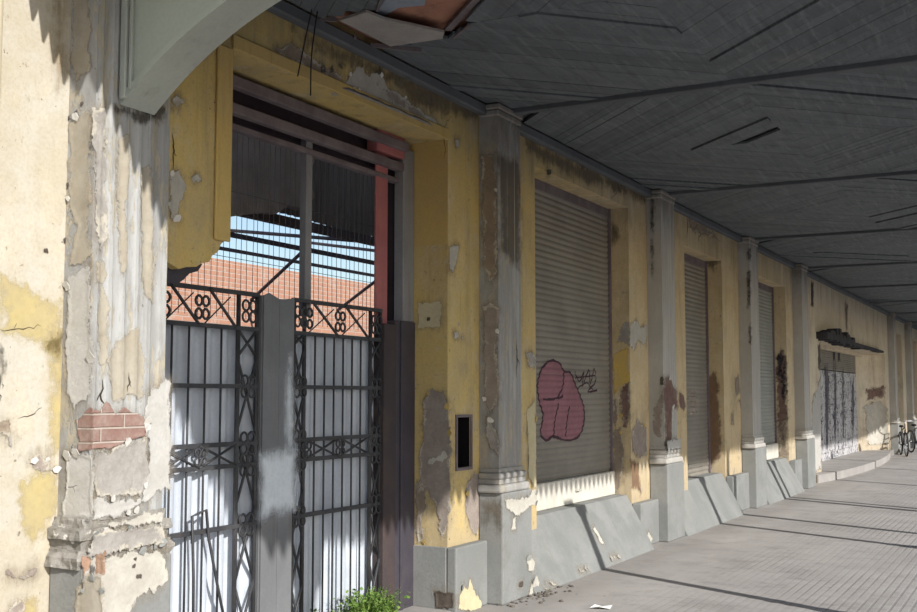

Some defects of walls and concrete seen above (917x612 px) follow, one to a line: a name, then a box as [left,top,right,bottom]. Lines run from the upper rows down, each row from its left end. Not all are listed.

spalling [275,43,437,124]
peeling [168,170,202,222]
peeling [0,102,173,541]
peeling [482,303,499,455]
peeling [612,321,686,490]
damp [776,353,788,400]
peeling [862,401,889,445]
peeling [414,389,453,544]
peeling [465,473,480,536]
peeling [505,401,538,530]
peeling [74,538,168,612]